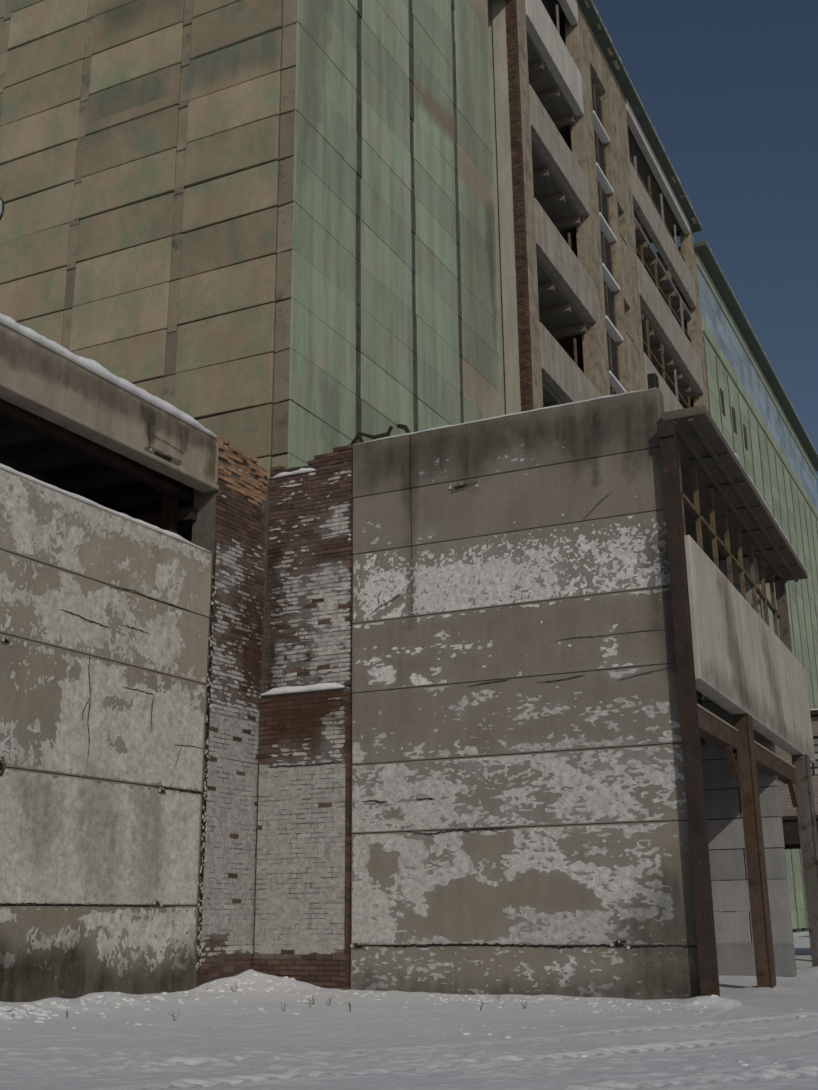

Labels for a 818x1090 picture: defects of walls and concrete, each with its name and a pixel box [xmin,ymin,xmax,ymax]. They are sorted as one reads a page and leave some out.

spalling [144,445,183,469]
crack [115,588,192,612]
crack [59,609,149,762]
crack [124,687,154,731]
peeling [0,457,695,998]
crack [156,745,205,795]